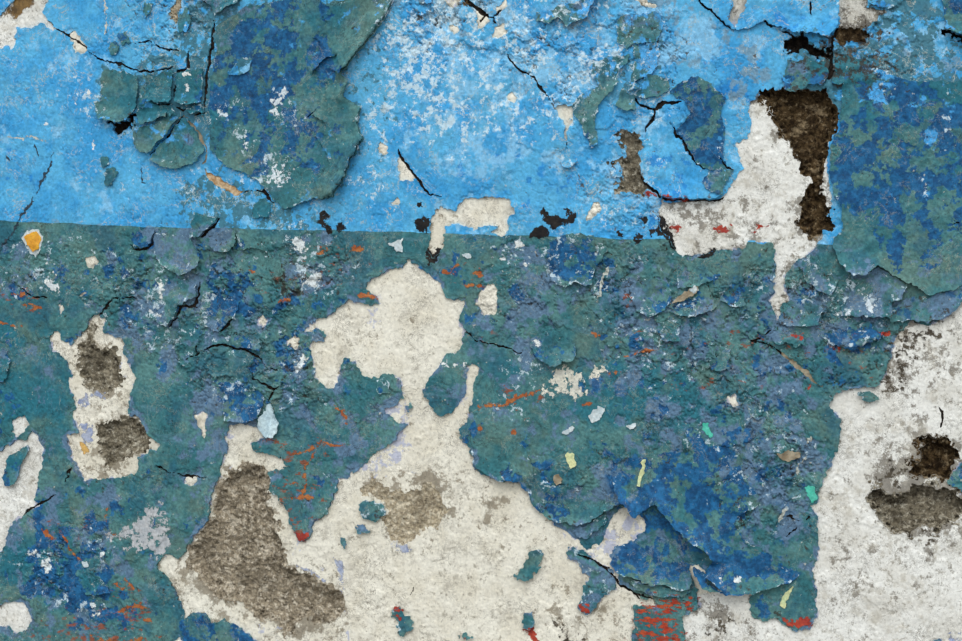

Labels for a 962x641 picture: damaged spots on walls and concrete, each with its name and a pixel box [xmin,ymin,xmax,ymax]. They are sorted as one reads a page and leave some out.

flaking render [0,0,57,50]
crack [49,21,215,164]
crack [507,54,550,100]
flaking render [606,0,962,641]
flaking render [0,415,44,552]
flaking render [50,314,160,481]
flaking render [158,259,656,641]
flaking render [0,601,32,634]